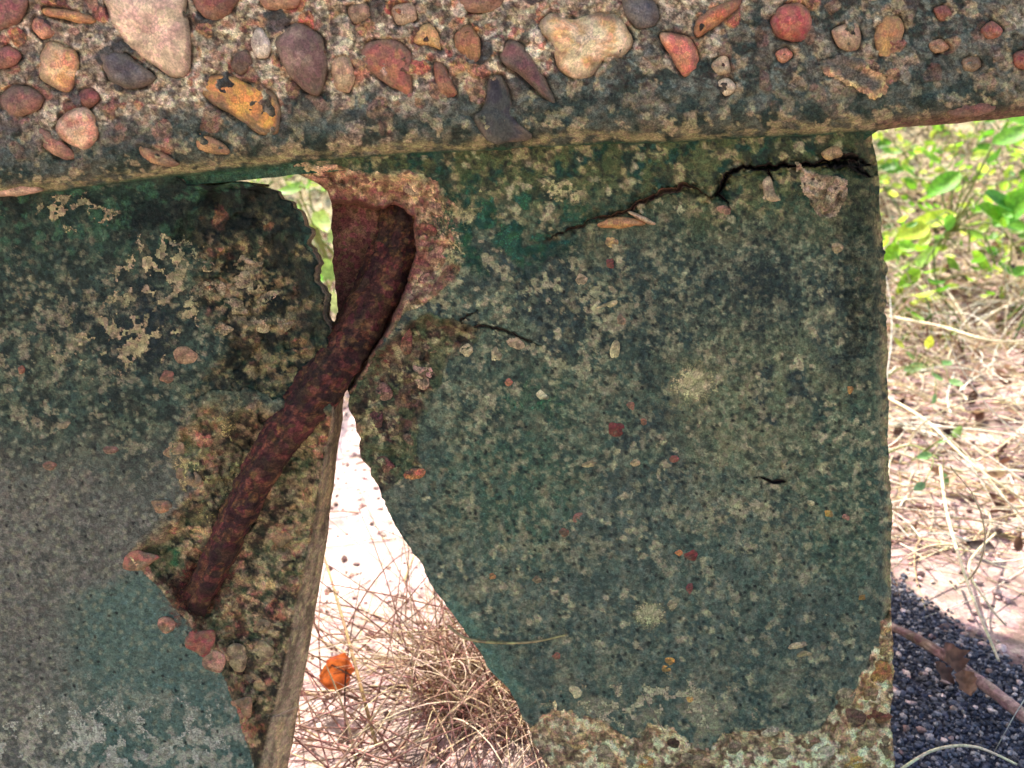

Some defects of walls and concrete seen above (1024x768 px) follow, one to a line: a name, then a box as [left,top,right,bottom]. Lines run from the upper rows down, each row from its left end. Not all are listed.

peeling [36,195,120,232]
spalling [66,190,331,768]
spalling [294,162,480,493]
crack [549,152,872,241]